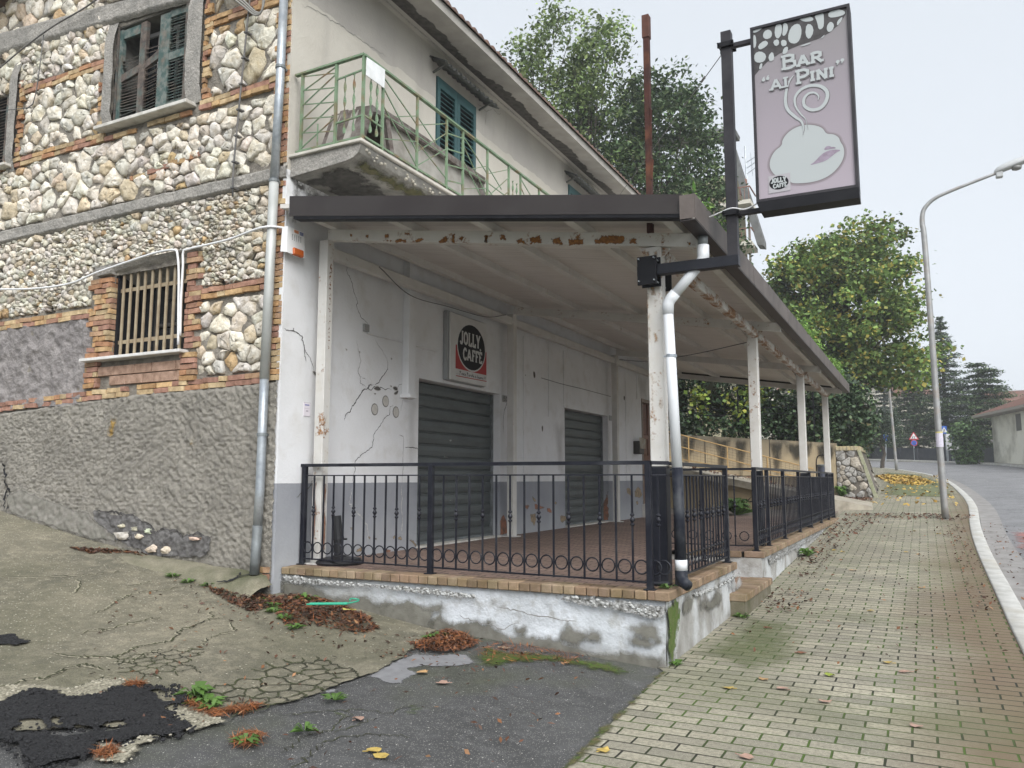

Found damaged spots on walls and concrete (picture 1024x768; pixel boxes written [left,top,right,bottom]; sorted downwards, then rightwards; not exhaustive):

corrosion [484,234,637,246]
crack [344,270,418,539]
flaking render [93,510,212,558]
flaking render [561,595,666,618]
crack [0,570,416,768]